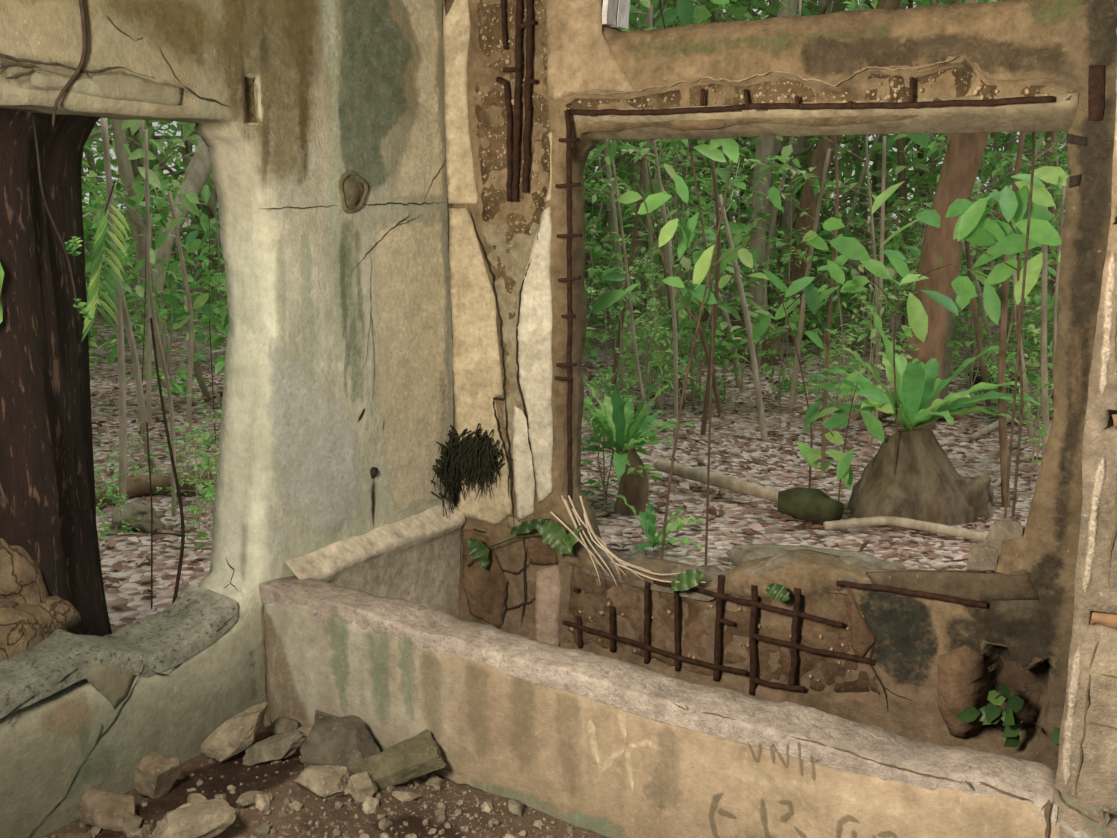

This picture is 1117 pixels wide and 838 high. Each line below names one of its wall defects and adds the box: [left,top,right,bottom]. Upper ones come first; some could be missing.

crack [0,15,231,108]
damp [803,24,1064,75]
spalling [1015,85,1049,97]
damp [1036,0,1117,69]
damp [105,0,449,531]
crack [265,160,540,628]
spalling [442,0,1039,695]
damp [1056,100,1109,539]
crack [1109,314,1117,372]
crack [1108,477,1117,584]
damp [860,555,1062,717]